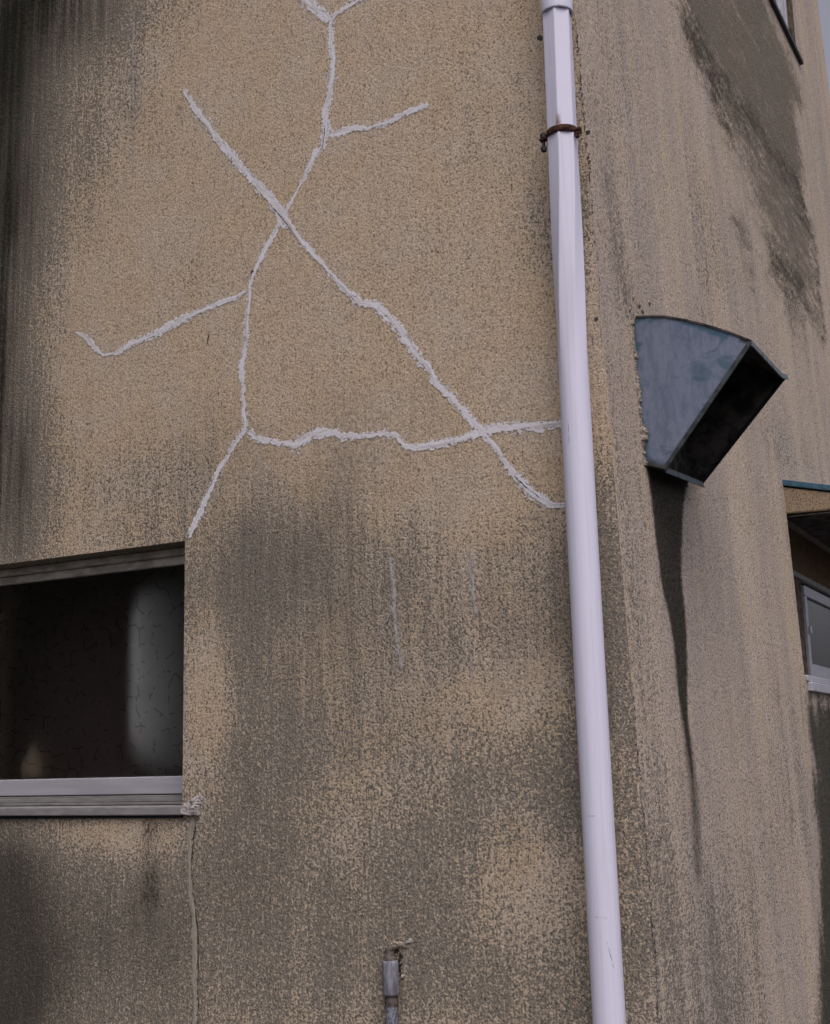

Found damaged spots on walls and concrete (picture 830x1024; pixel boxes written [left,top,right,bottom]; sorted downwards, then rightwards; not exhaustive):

crack [75,0,565,539]
damp [678,0,827,344]
crack [187,817,199,1024]